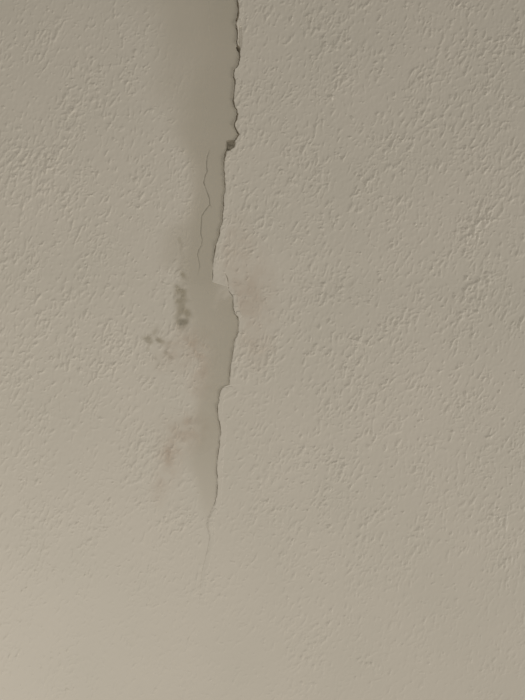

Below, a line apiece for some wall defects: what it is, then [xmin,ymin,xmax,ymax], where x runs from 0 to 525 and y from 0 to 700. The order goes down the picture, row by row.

crack [197,0,240,501]
peeling [208,0,246,282]
peeling [199,294,245,607]